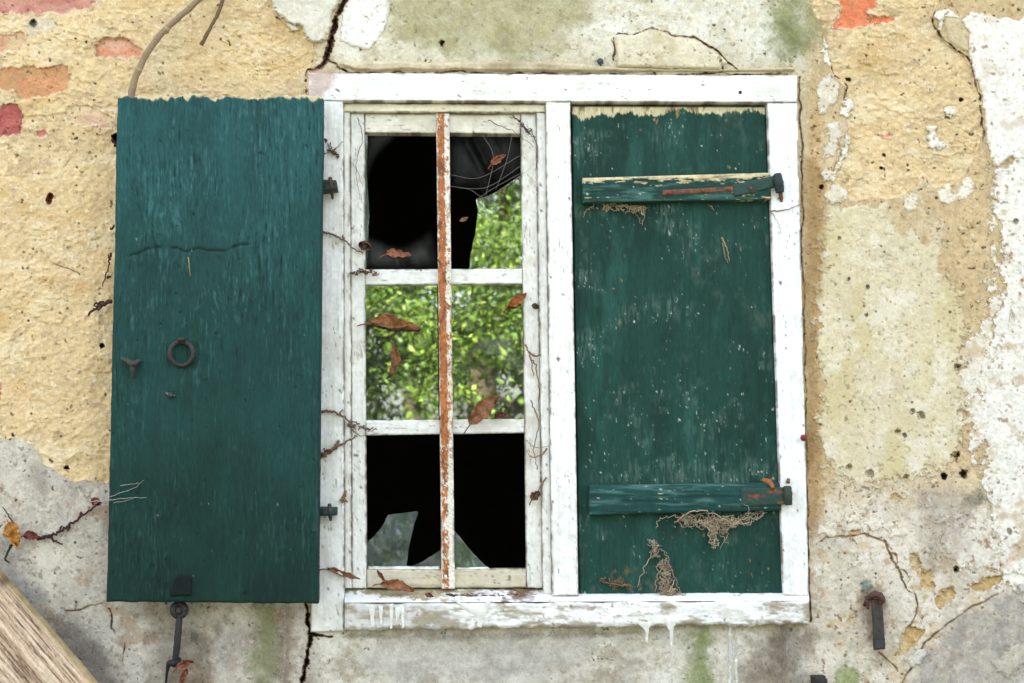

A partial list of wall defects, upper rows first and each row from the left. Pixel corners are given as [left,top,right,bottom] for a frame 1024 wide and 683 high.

flaking render [0,0,390,484]
crack [304,0,556,95]
crack [587,11,998,683]
peeling [806,0,1024,609]
crack [300,603,333,683]